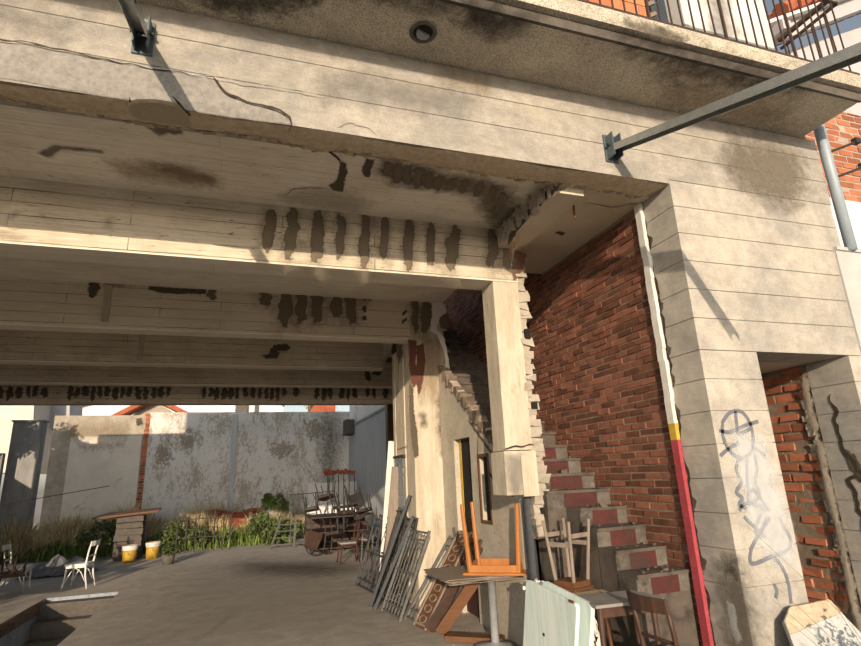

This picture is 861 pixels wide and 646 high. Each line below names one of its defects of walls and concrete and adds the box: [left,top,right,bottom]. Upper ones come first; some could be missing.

crack [0,39,319,131]
water stain [621,32,784,87]
crack [283,152,348,196]
peeling [0,84,666,251]
spalling [87,282,124,298]
spalling [148,286,217,301]
spalling [408,303,493,458]
spalling [516,267,551,539]